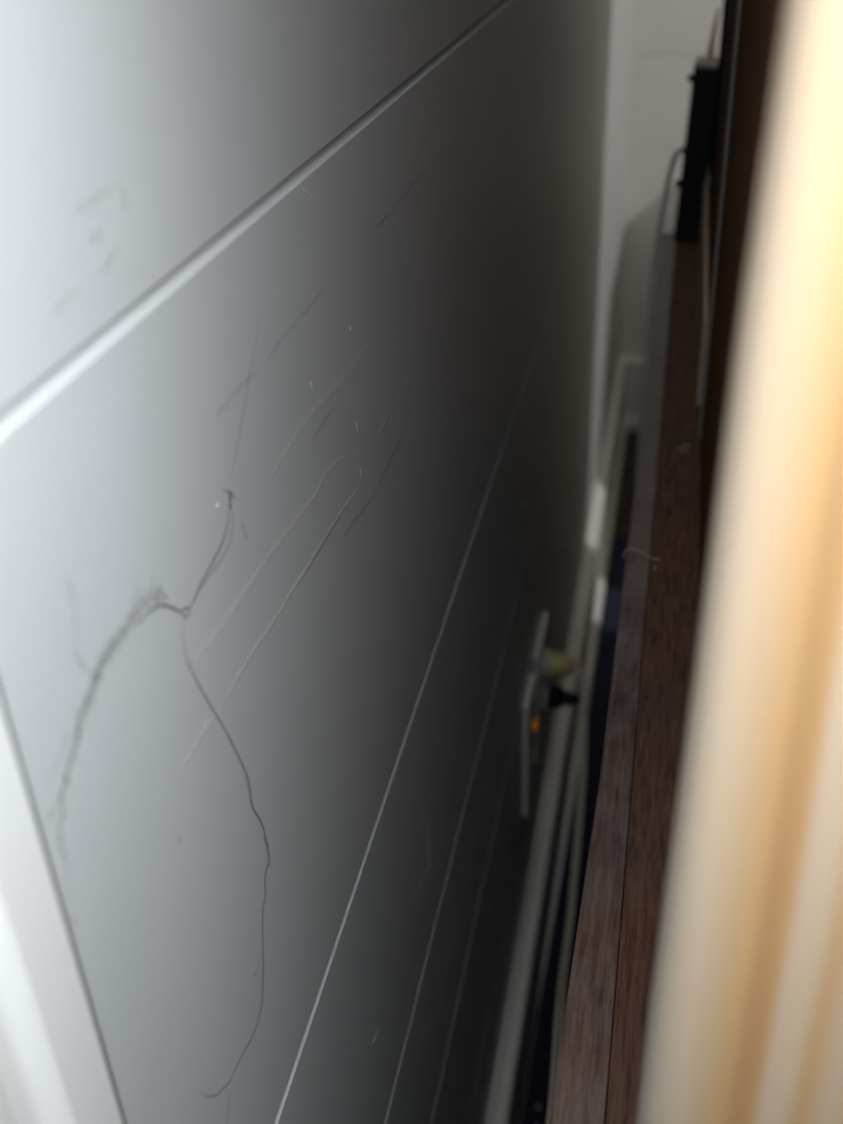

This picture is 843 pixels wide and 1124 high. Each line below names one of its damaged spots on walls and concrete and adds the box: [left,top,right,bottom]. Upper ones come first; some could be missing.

crack [138,490,270,1092]